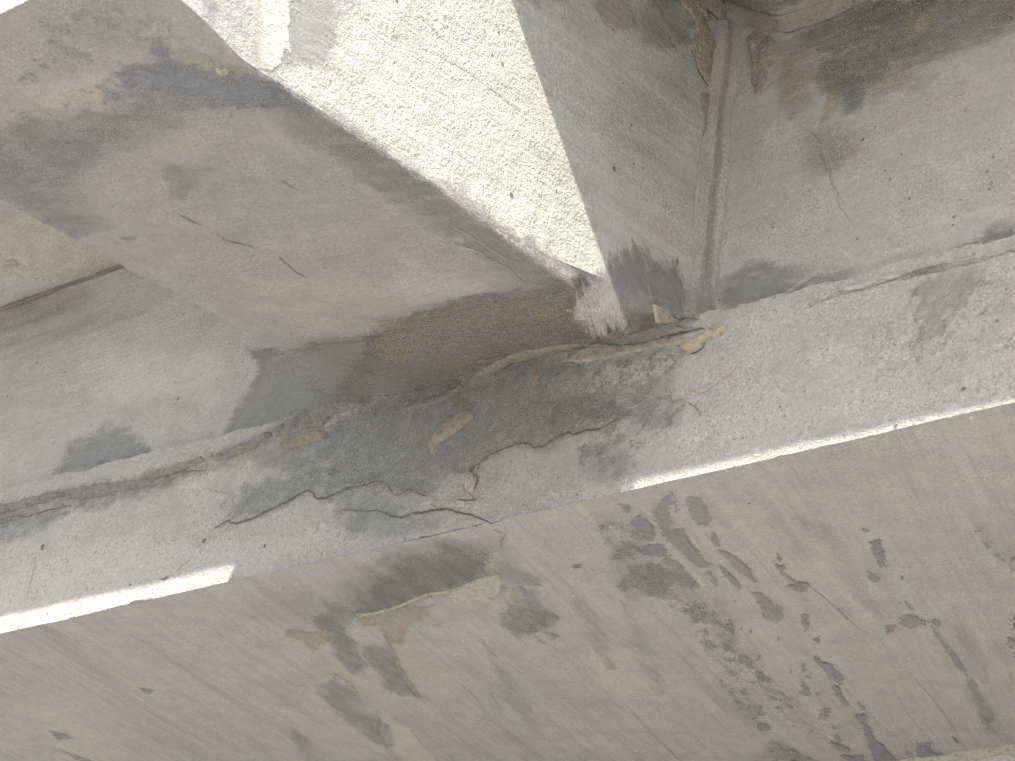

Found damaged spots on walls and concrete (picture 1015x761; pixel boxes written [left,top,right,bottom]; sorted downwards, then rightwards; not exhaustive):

peeling [256,0,291,70]
leakage [283,0,336,67]
peeling [678,0,716,86]
leakage [815,0,1015,94]
leakage [226,239,684,512]
peeling [563,319,727,397]
crack [130,371,733,603]
leakage [356,544,483,611]
leakage [316,608,419,745]